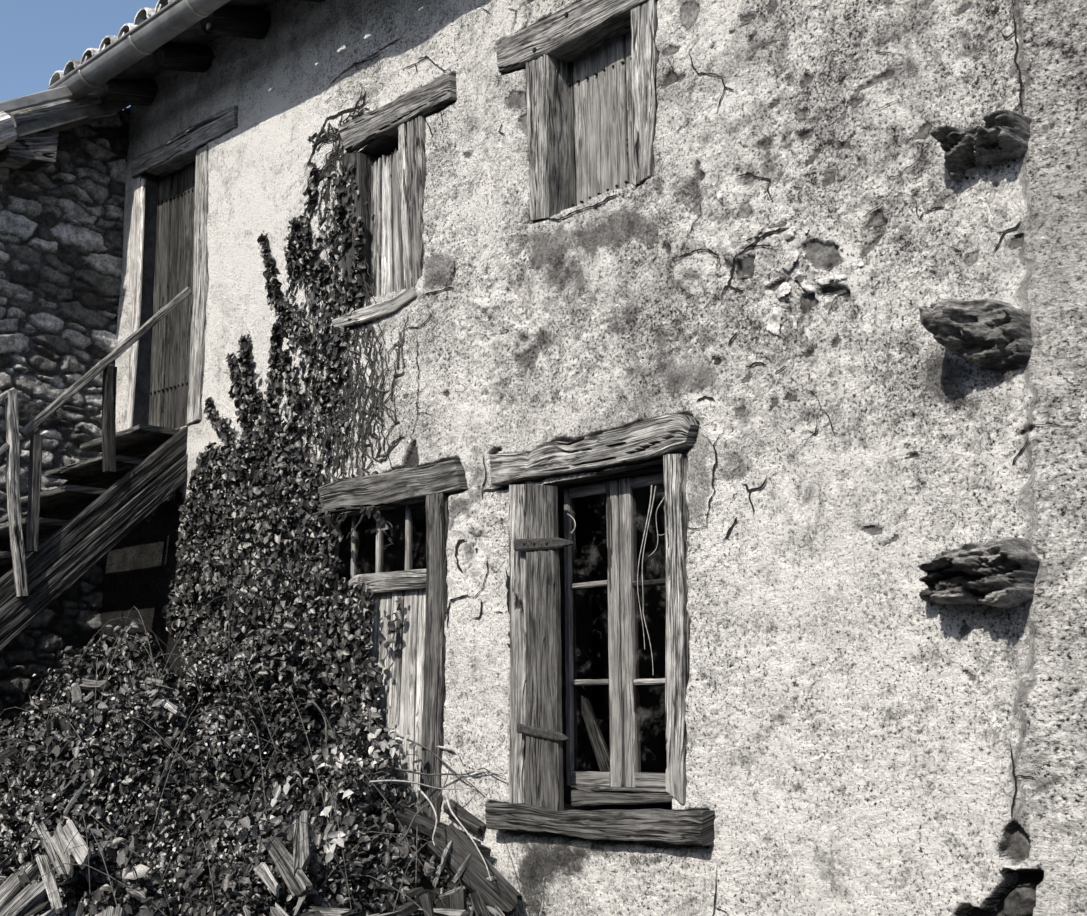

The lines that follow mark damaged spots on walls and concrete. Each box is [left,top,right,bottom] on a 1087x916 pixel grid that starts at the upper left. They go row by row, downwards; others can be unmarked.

crack [654,1,733,136]
crack [1001,0,1023,113]
flaking render [713,254,755,283]
flaking render [739,203,752,218]
flaking render [766,221,850,336]
flaking render [856,211,887,266]
crack [687,431,767,540]
crack [1010,746,1037,818]
spalling [954,821,1044,916]